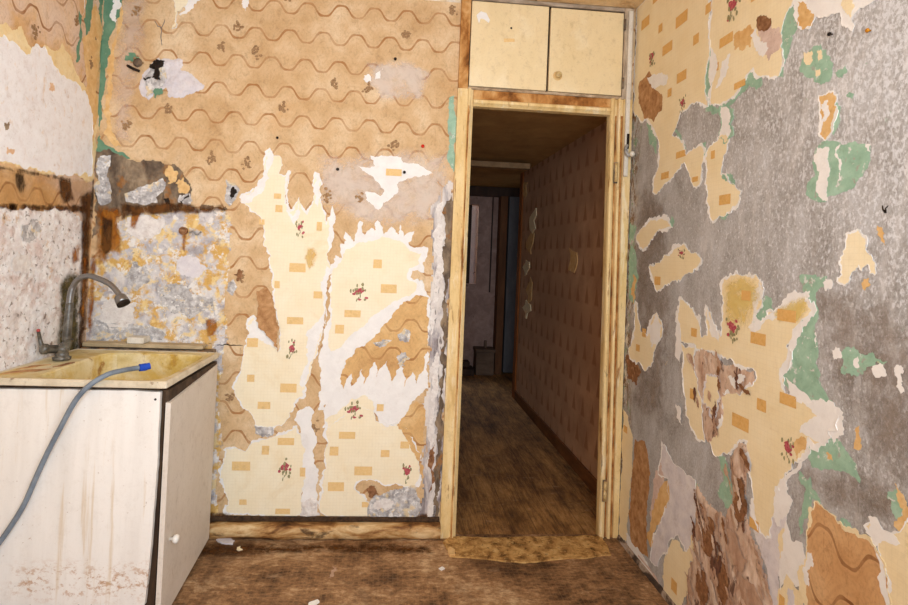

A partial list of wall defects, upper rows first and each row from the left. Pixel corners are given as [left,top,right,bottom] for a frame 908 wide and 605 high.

peeling [778,7,798,77]
peeling [799,45,847,85]
peeling [638,71,663,154]
peeling [699,132,742,224]
peeling [806,100,871,203]
spalling [0,0,243,515]
peeling [300,96,457,517]
peeling [626,354,641,385]
peeling [783,274,833,402]
peeling [832,346,904,394]
peeling [799,416,862,536]
peeling [887,484,908,531]